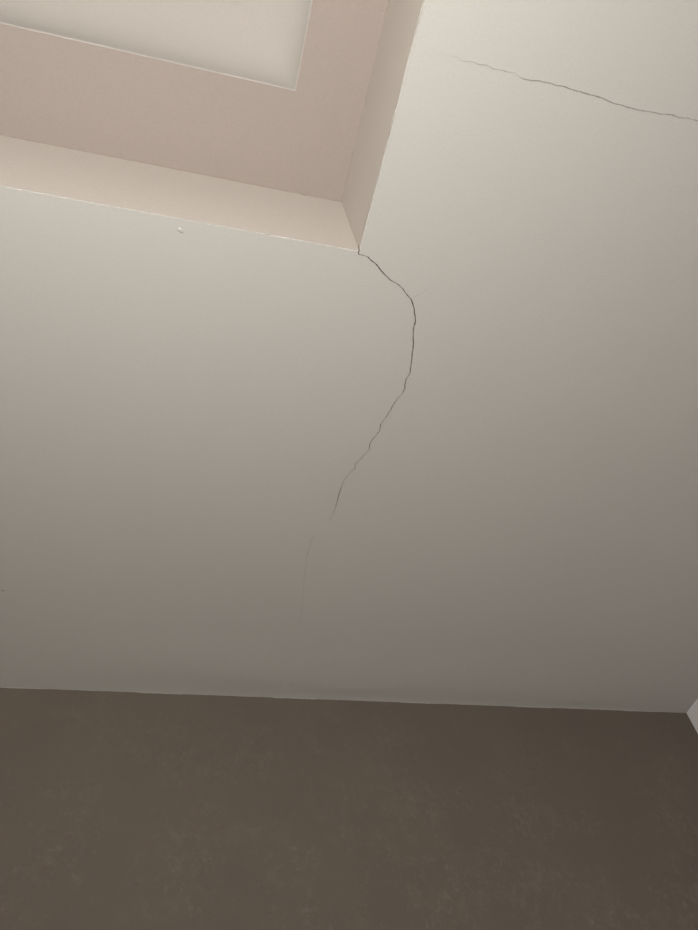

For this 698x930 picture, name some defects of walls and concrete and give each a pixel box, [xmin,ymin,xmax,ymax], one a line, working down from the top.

crack [358,246,416,449]